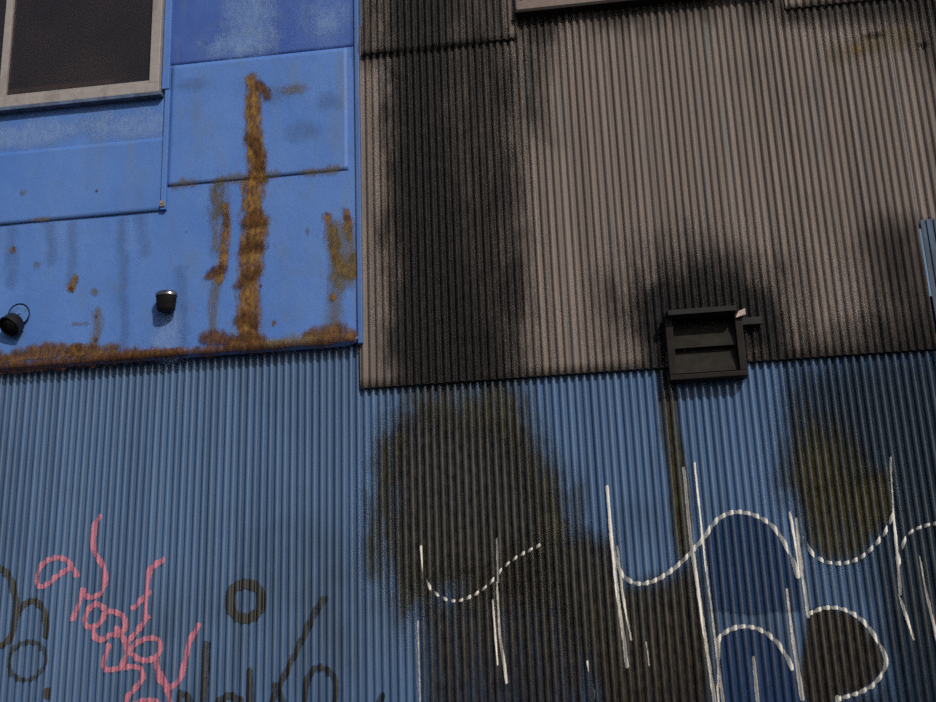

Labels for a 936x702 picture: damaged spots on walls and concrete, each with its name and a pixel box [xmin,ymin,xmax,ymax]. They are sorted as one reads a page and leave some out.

rust [0,73,358,373]